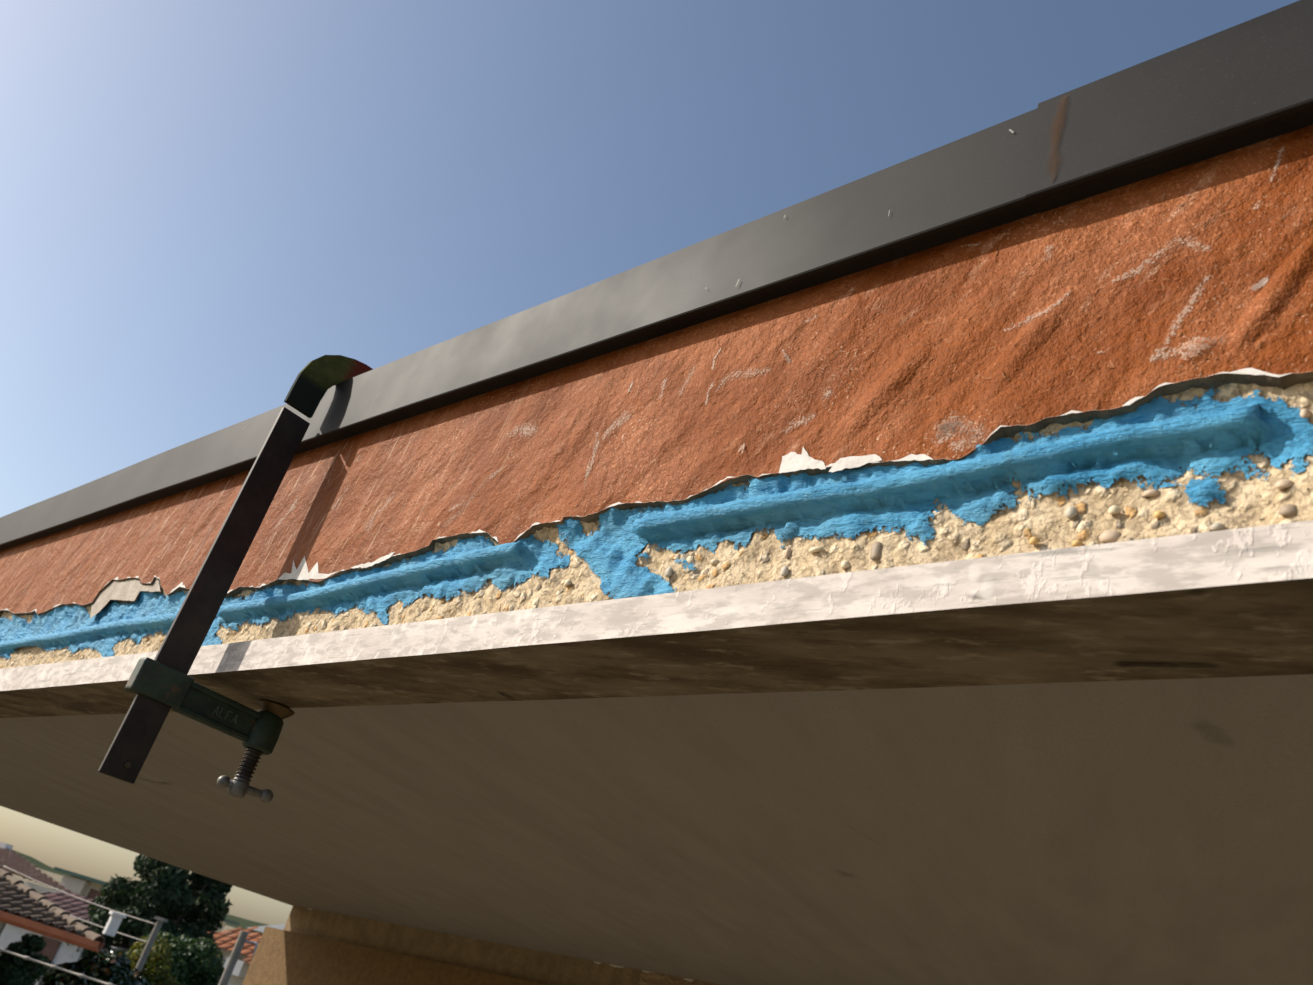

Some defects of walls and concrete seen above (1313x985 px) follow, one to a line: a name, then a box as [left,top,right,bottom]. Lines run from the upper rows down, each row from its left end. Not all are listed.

peeling [705,348,771,406]
spalling [202,368,1313,646]
spalling [0,576,190,669]